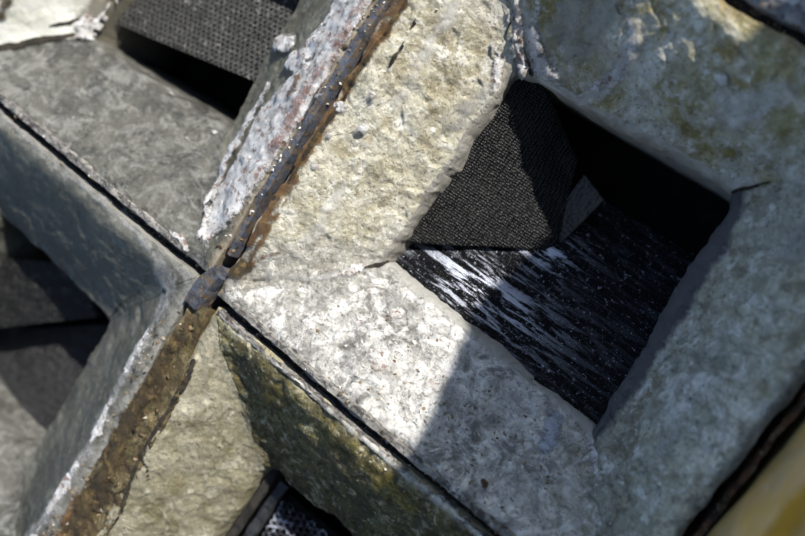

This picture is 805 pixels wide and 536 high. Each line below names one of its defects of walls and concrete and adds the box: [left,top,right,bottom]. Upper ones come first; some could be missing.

rust [227,0,409,280]
rust [55,332,189,536]
rust [683,382,805,536]